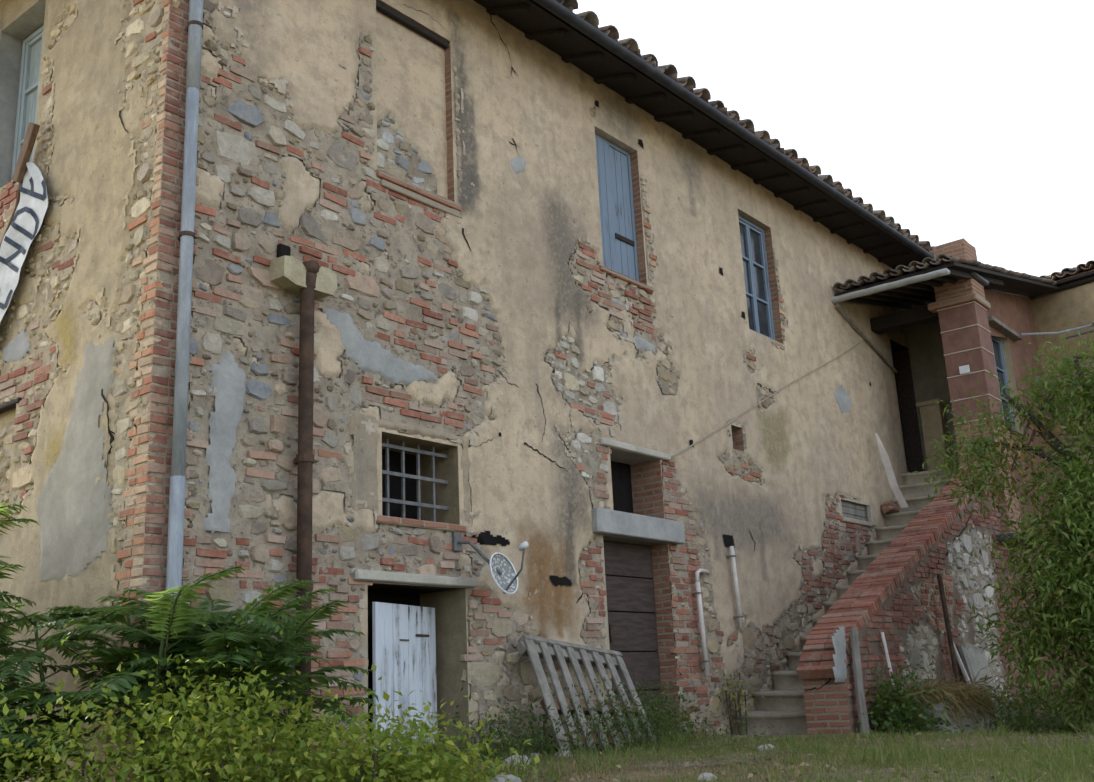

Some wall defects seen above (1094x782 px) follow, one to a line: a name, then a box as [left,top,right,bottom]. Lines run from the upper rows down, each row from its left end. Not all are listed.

spalling [34,3,77,174]
crack [489,14,518,79]
spalling [0,181,20,243]
spalling [0,223,79,517]
crack [101,389,137,498]
spalling [82,0,189,782]
spalling [181,0,582,770]
spalling [545,175,681,510]
spalling [718,422,766,486]
spalling [873,501,899,514]
spalling [657,460,874,736]